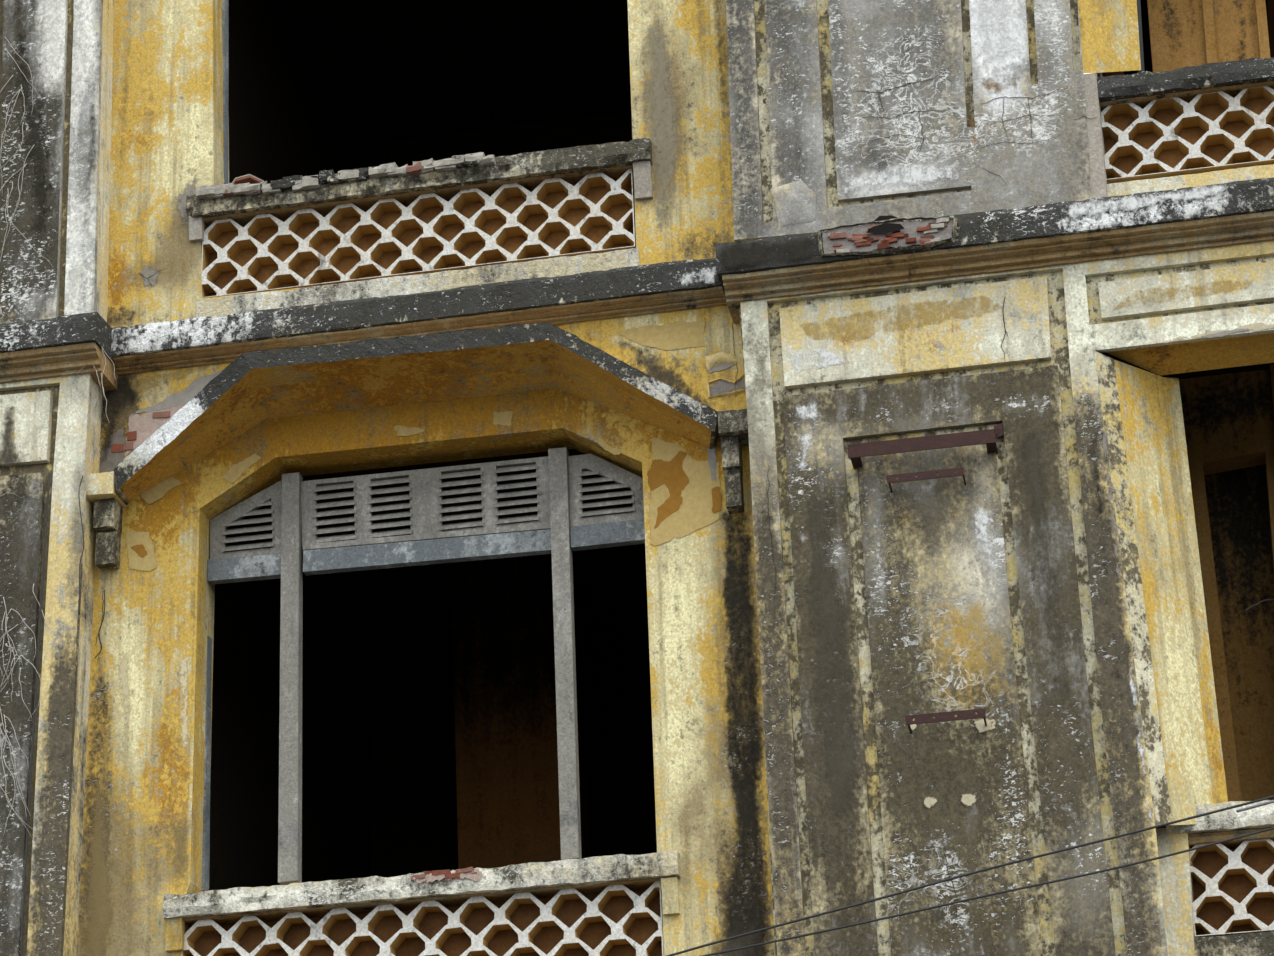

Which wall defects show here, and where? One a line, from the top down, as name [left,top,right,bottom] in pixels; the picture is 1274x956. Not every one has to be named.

damp [17,32,48,231]
damp [644,20,678,226]
flaking render [817,215,957,257]
damp [2,407,17,464]
flaking render [99,369,224,473]
peeling [647,438,722,546]
efflorescence [975,508,994,567]
damp [711,513,767,956]
flaking render [411,867,482,884]